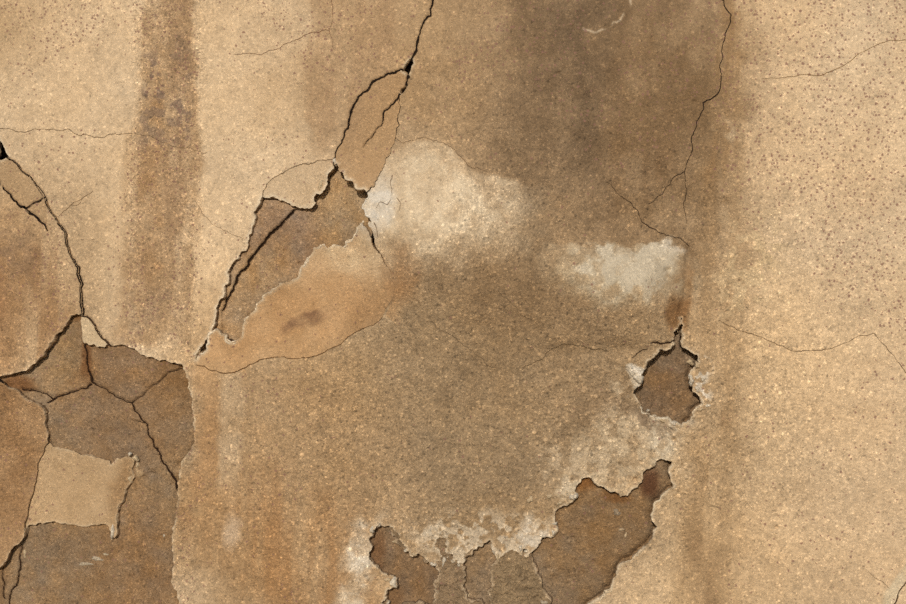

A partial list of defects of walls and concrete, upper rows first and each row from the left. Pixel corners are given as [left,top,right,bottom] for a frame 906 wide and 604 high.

spalling [0,158,196,604]
damp [106,0,211,357]
crack [0,128,377,490]
spalling [195,70,408,360]
crack [262,0,485,236]
damp [174,0,803,604]
spalling [628,318,710,426]
crack [607,0,732,246]
spalling [369,459,675,604]